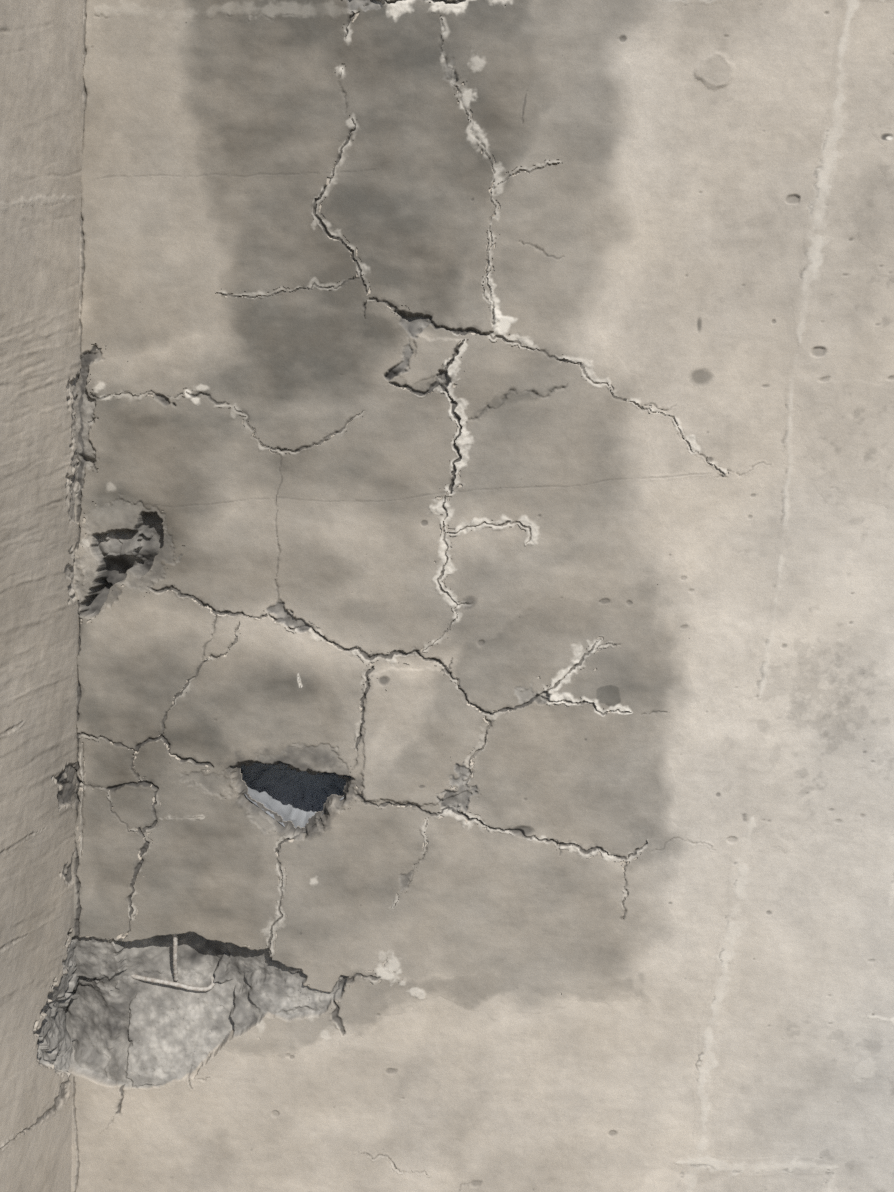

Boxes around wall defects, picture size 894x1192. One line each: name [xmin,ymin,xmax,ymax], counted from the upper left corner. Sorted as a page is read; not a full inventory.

hole [62,481,185,621]
damp [75,0,704,1060]
crack [51,0,776,956]
hole [229,741,360,845]
spalling [32,924,353,1092]
crack [327,948,427,1040]
crack [0,1075,127,1192]